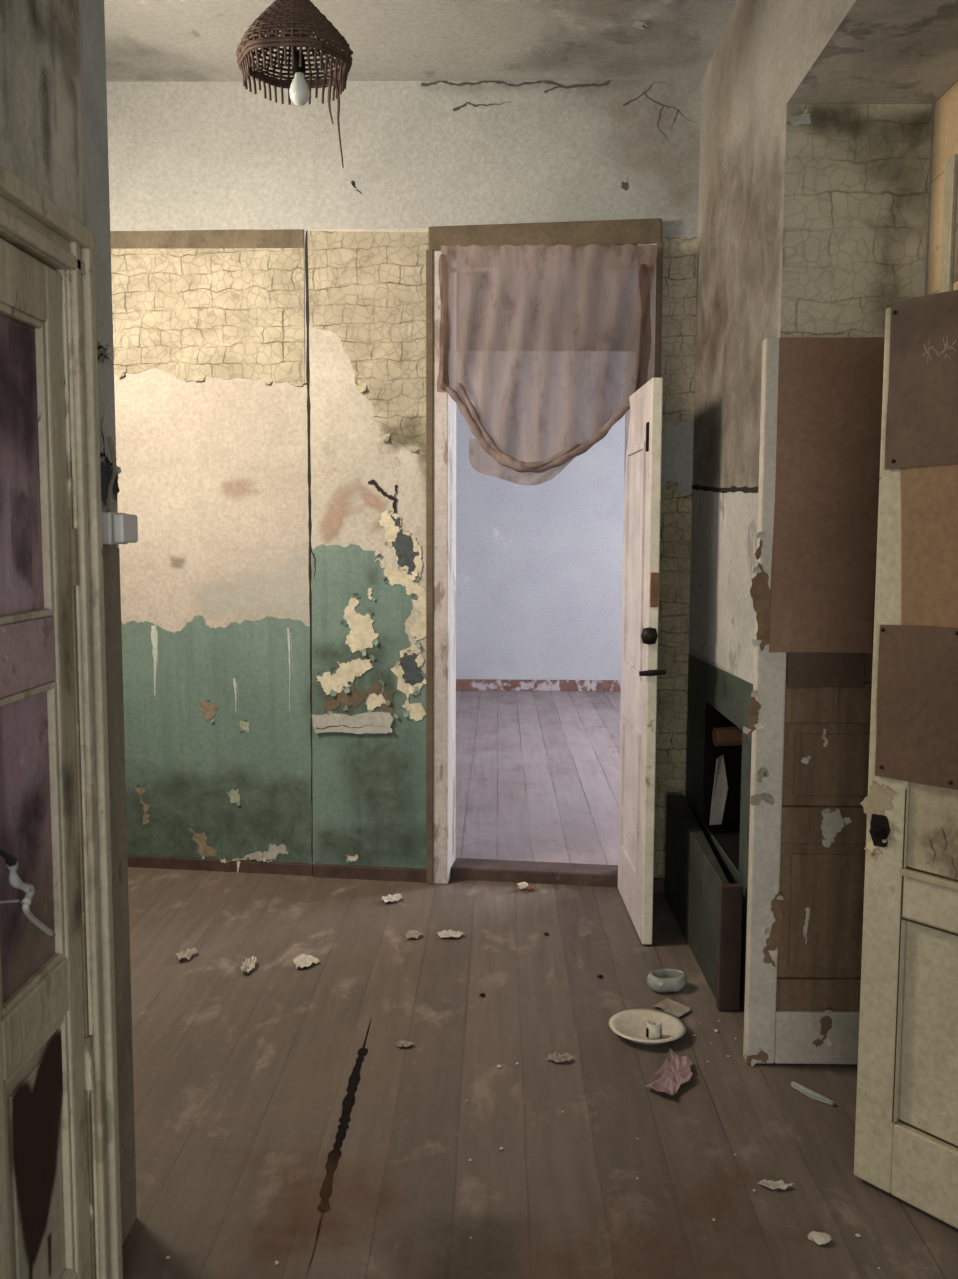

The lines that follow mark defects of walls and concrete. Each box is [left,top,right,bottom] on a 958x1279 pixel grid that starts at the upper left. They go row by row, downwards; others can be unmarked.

crack [421,80,695,143]
peeling [317,510,426,721]
crack [307,1020,371,1273]